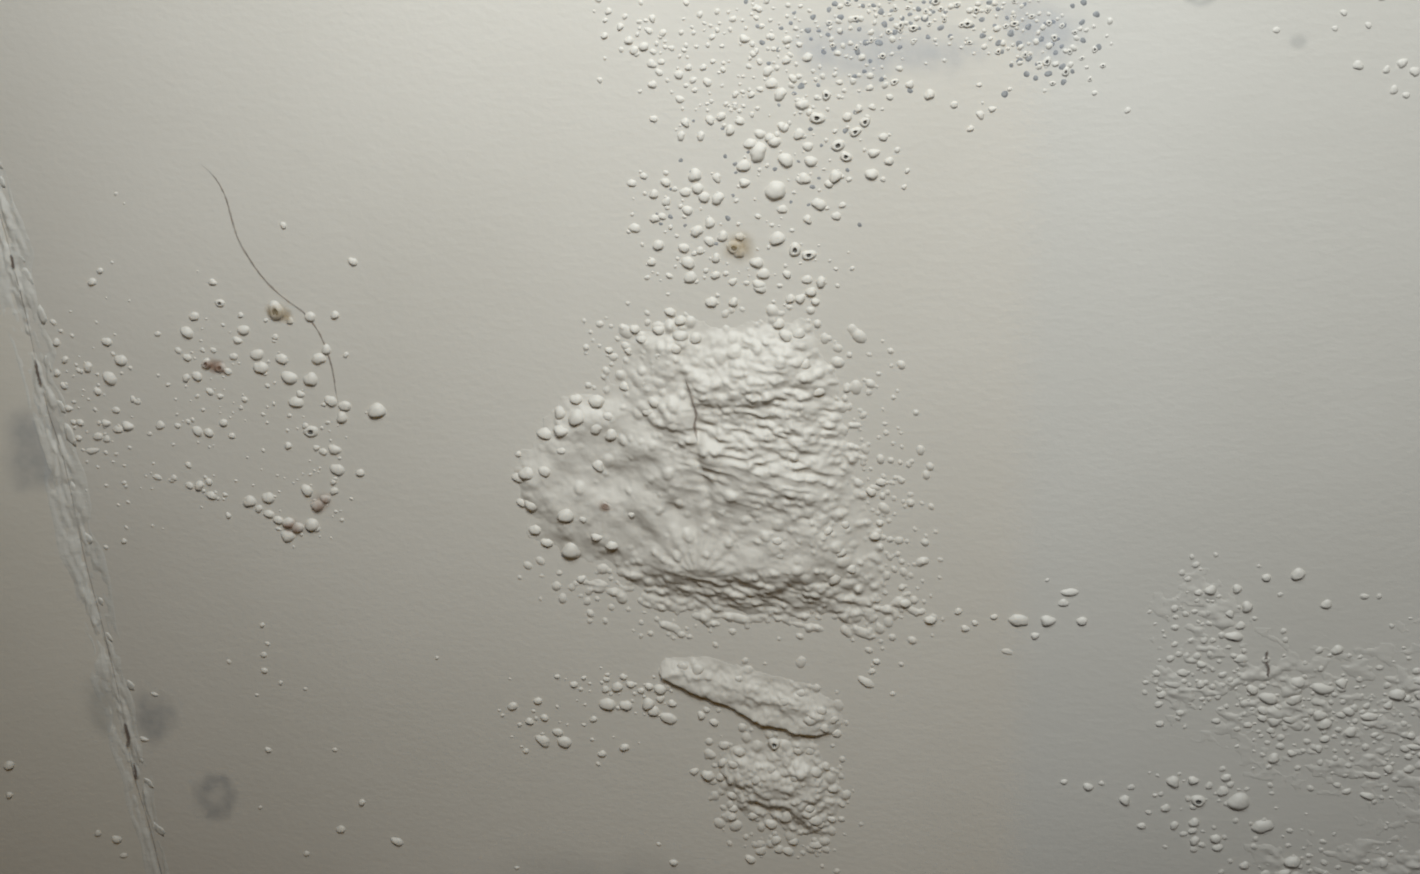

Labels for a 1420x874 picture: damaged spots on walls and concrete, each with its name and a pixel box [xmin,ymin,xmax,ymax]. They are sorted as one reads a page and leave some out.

crack [0,162,169,874]